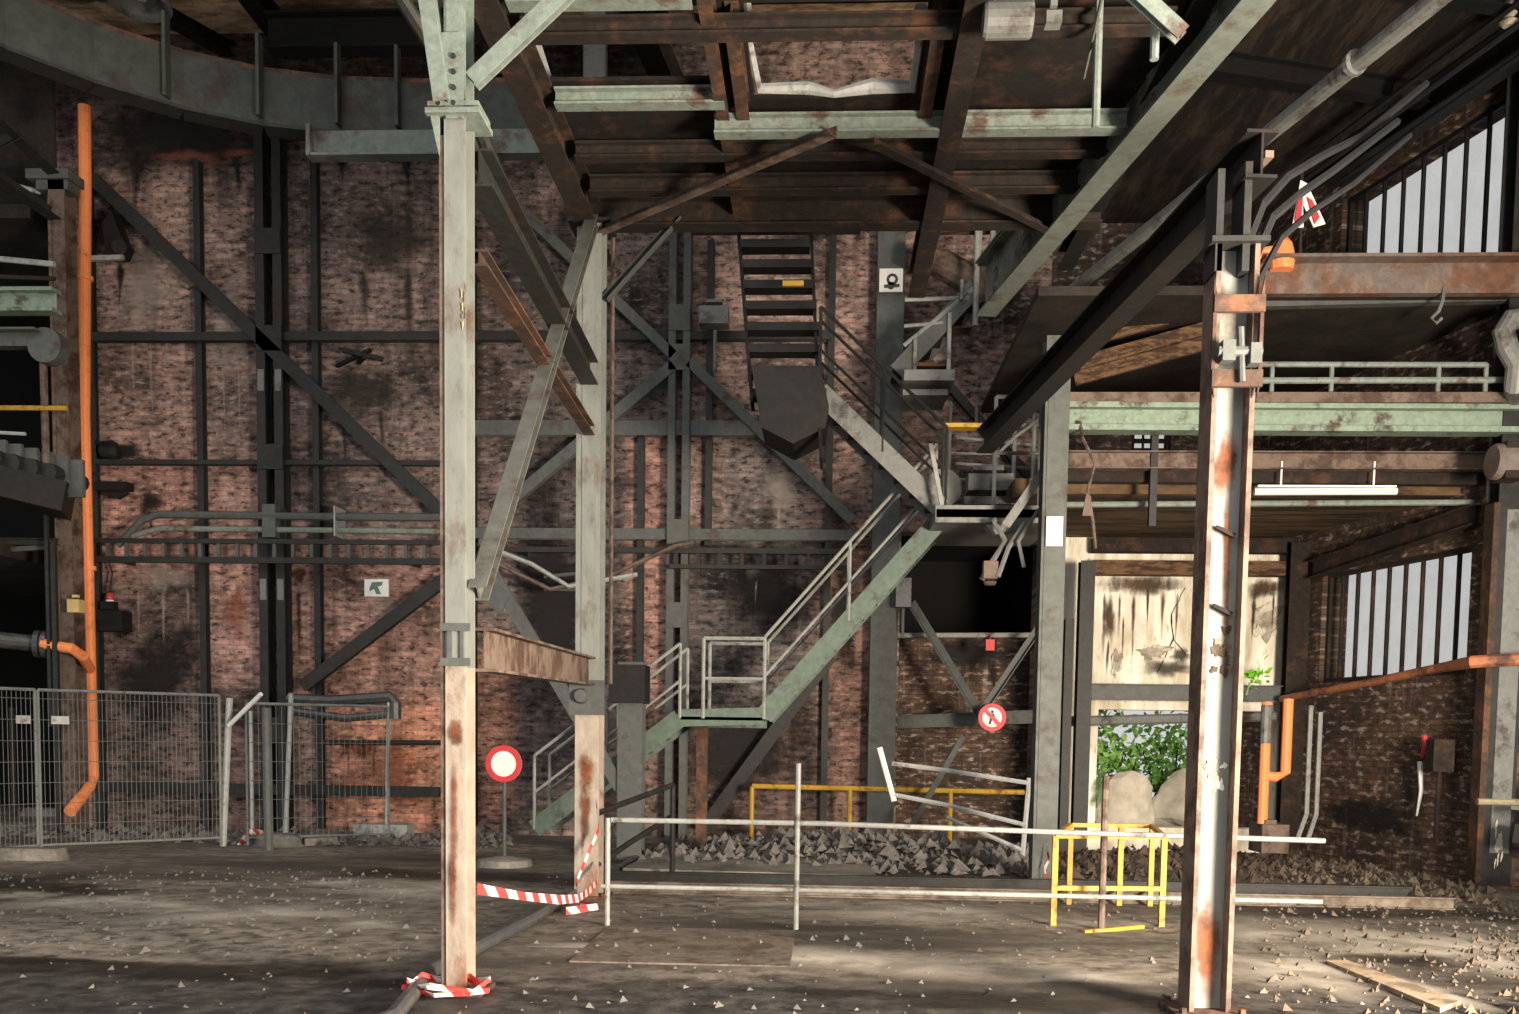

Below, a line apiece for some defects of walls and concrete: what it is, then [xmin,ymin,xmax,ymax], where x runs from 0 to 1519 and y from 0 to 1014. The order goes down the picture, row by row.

corrosion [1214,442,1237,488]
leakage [1103,576,1178,664]
leakage [1251,581,1280,632]
corrosion [449,722,462,744]
corrosion [1197,911,1220,982]